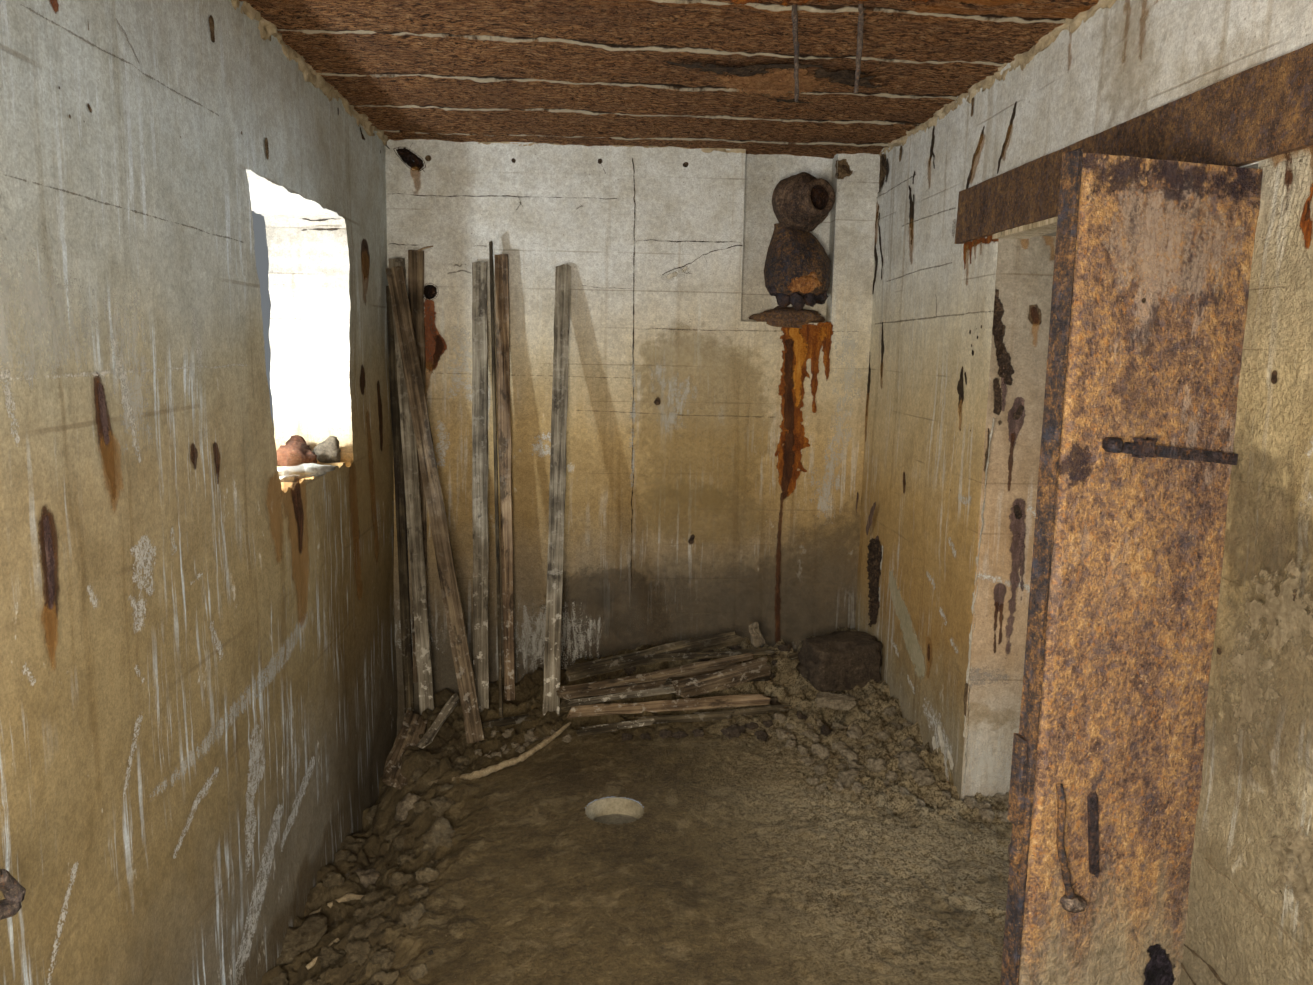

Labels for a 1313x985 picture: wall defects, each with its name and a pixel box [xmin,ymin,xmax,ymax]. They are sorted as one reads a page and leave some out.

corrosion [1284,153,1313,249]
corrosion [963,235,999,269]
corrosion [424,299,447,371]
corrosion [775,322,833,643]
corrosion [38,506,59,660]